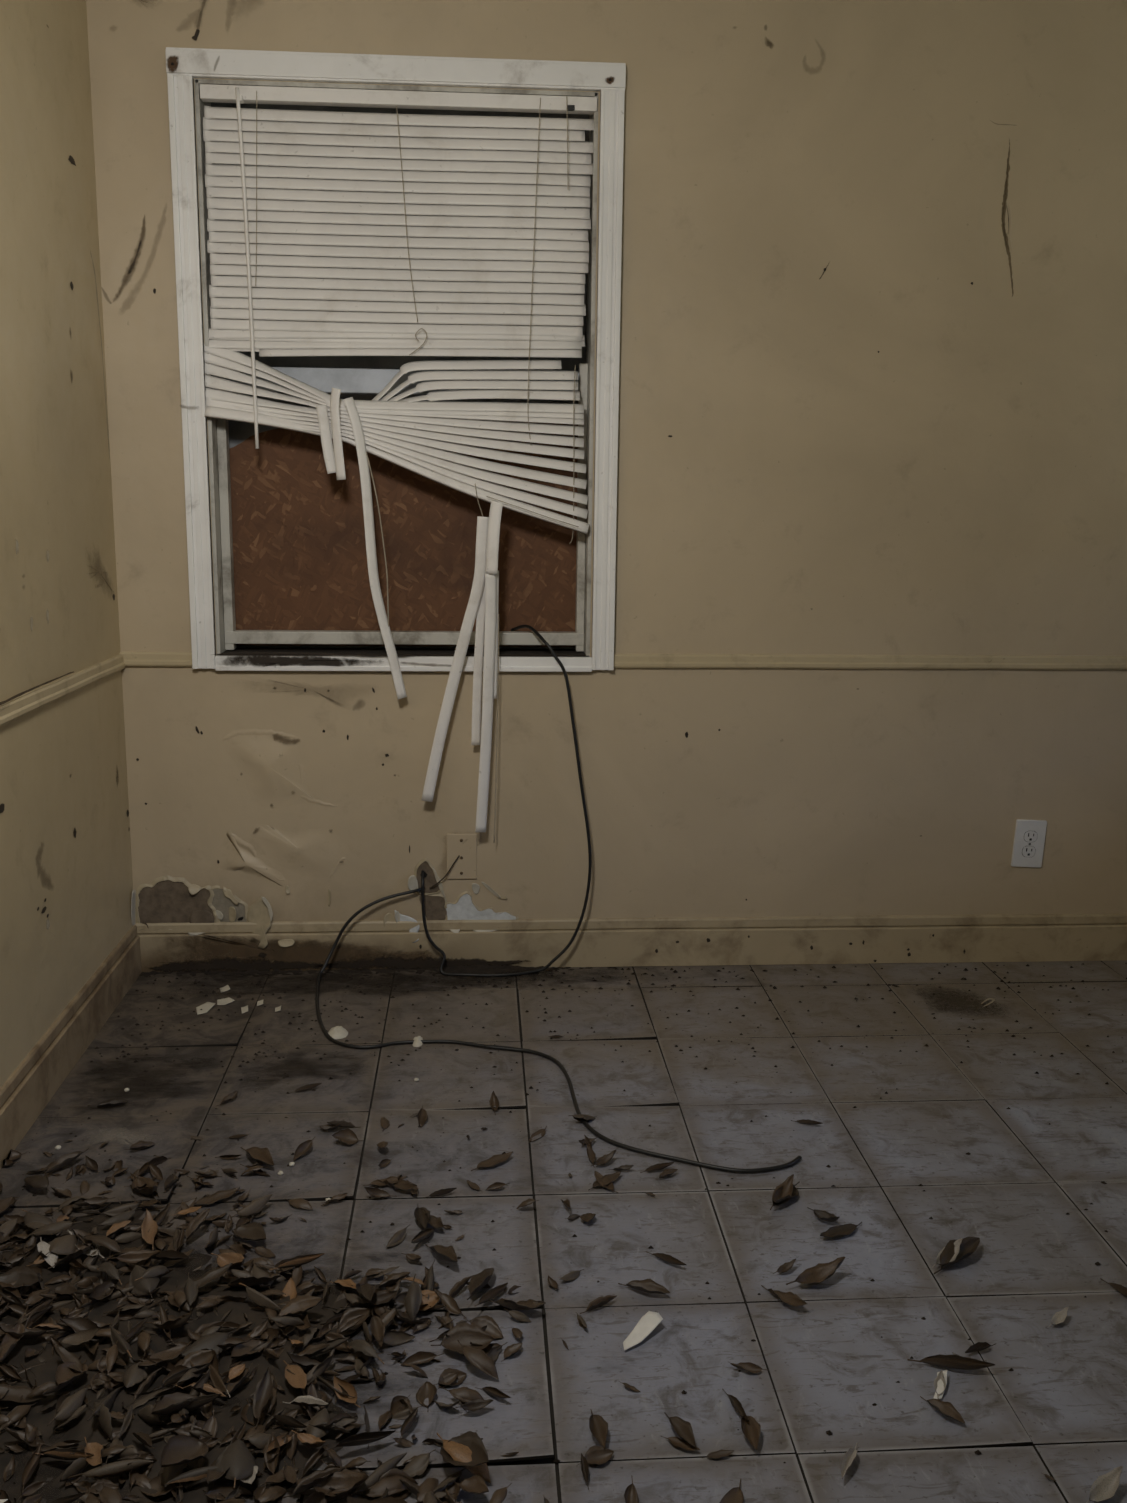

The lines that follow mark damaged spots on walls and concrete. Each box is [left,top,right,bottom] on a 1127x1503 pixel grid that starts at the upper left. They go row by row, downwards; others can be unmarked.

spalling [131,875,295,949]